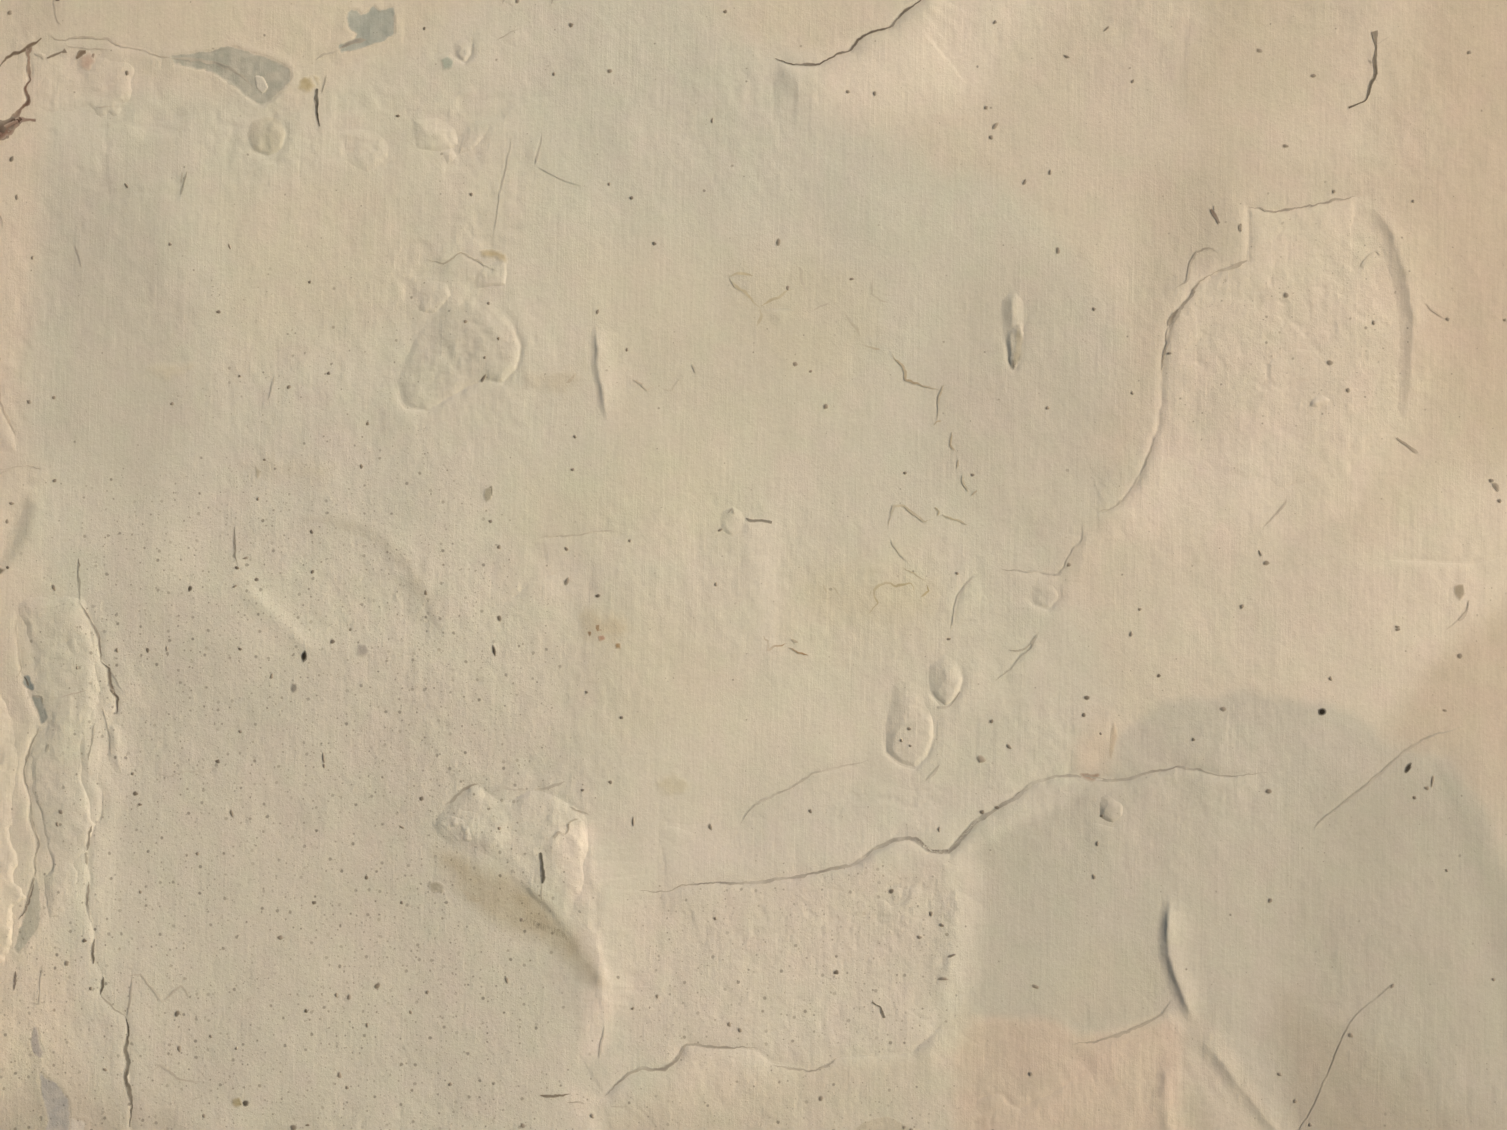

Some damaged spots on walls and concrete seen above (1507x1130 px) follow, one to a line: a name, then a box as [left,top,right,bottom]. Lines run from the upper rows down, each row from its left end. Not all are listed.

crack [0,0,170,147]
peeling [155,0,406,119]
crack [0,558,201,1130]
spalling [431,757,605,832]